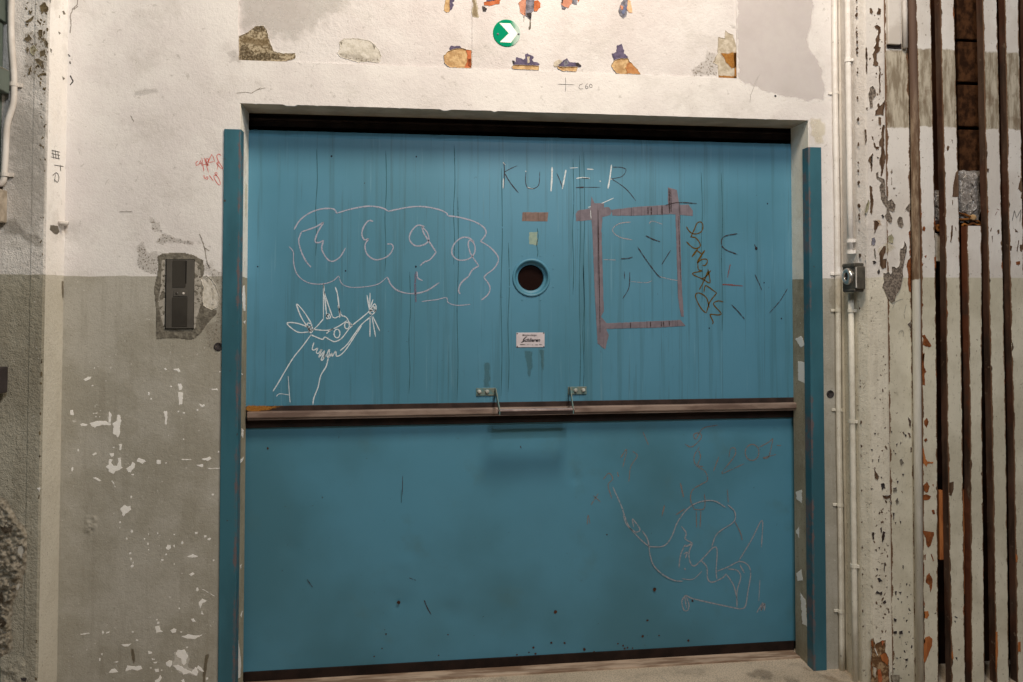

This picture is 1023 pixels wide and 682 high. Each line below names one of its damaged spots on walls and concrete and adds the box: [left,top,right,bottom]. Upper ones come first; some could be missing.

peeling [518,0,541,30]
peeling [561,0,579,10]
peeling [618,0,632,18]
flaking render [238,25,296,62]
flaking render [443,46,472,68]
flaking render [512,53,539,70]
flaking render [554,58,581,72]
flaking render [611,44,640,75]
peeling [855,0,936,303]
peeling [70,410,167,487]
spalling [0,497,27,658]
peeling [109,619,208,682]